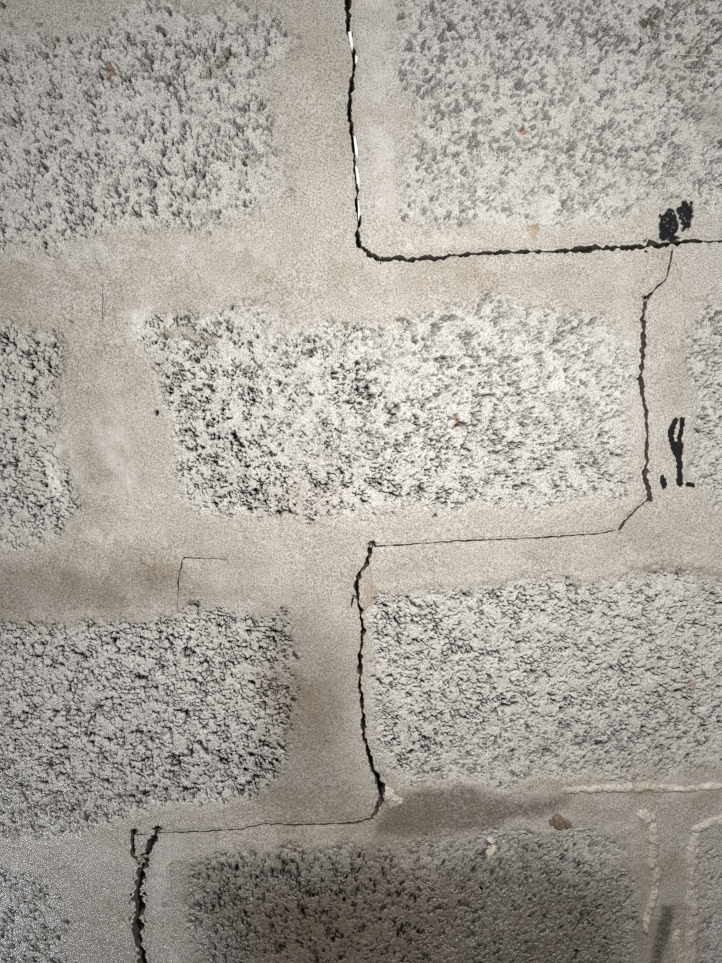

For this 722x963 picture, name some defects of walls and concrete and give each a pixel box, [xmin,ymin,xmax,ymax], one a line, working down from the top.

crack [99,285,107,323]
crack [341,0,722,549]
crack [127,543,387,963]
water stain [379,792,557,834]
water stain [209,856,613,963]